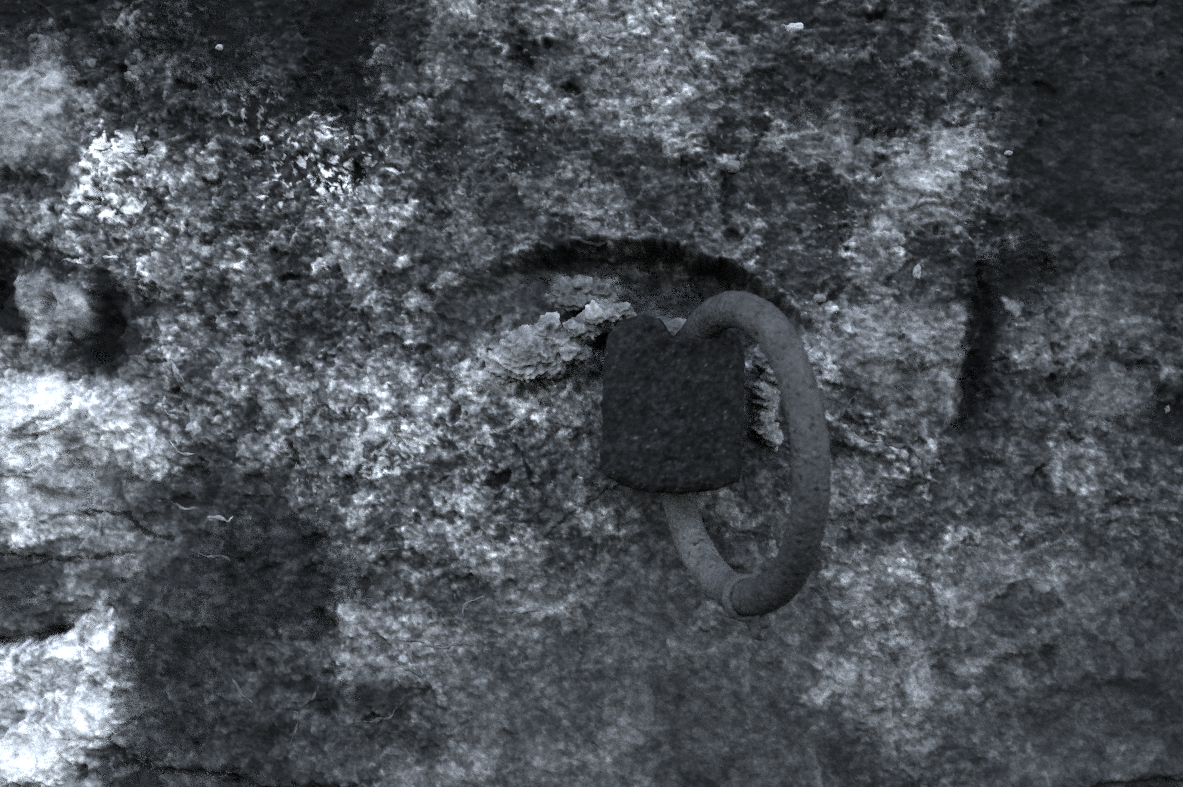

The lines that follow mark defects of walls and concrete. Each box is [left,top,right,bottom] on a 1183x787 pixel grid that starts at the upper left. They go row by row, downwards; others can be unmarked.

spalling [434,236,740,339]
crack [100,728,263,787]
crack [352,778,378,787]
crack [1095,774,1183,787]